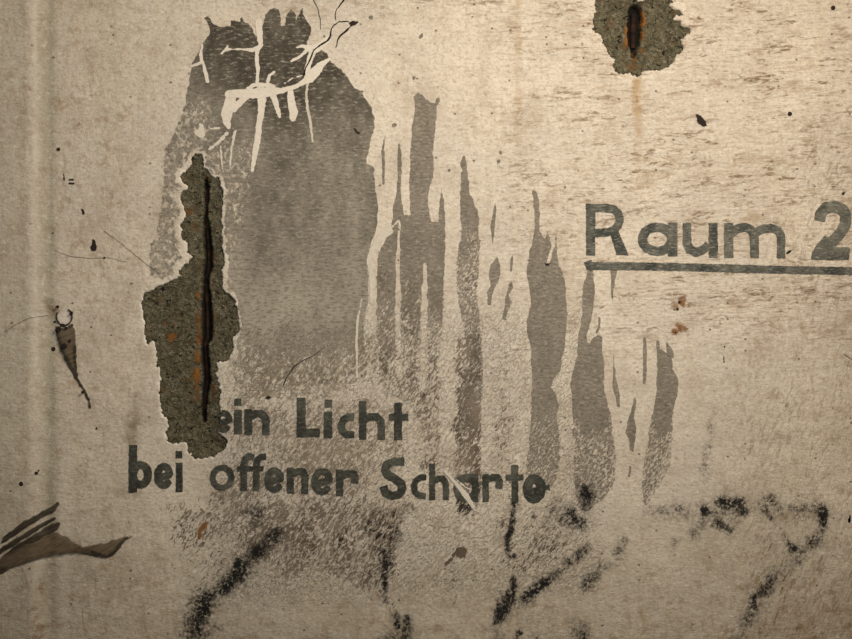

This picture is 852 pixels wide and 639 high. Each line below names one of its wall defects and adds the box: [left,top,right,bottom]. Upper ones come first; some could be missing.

spalling [592,0,690,78]
spalling [141,154,444,609]
peeling [451,334,483,515]
flaking render [445,547,467,604]
peeling [496,517,573,574]